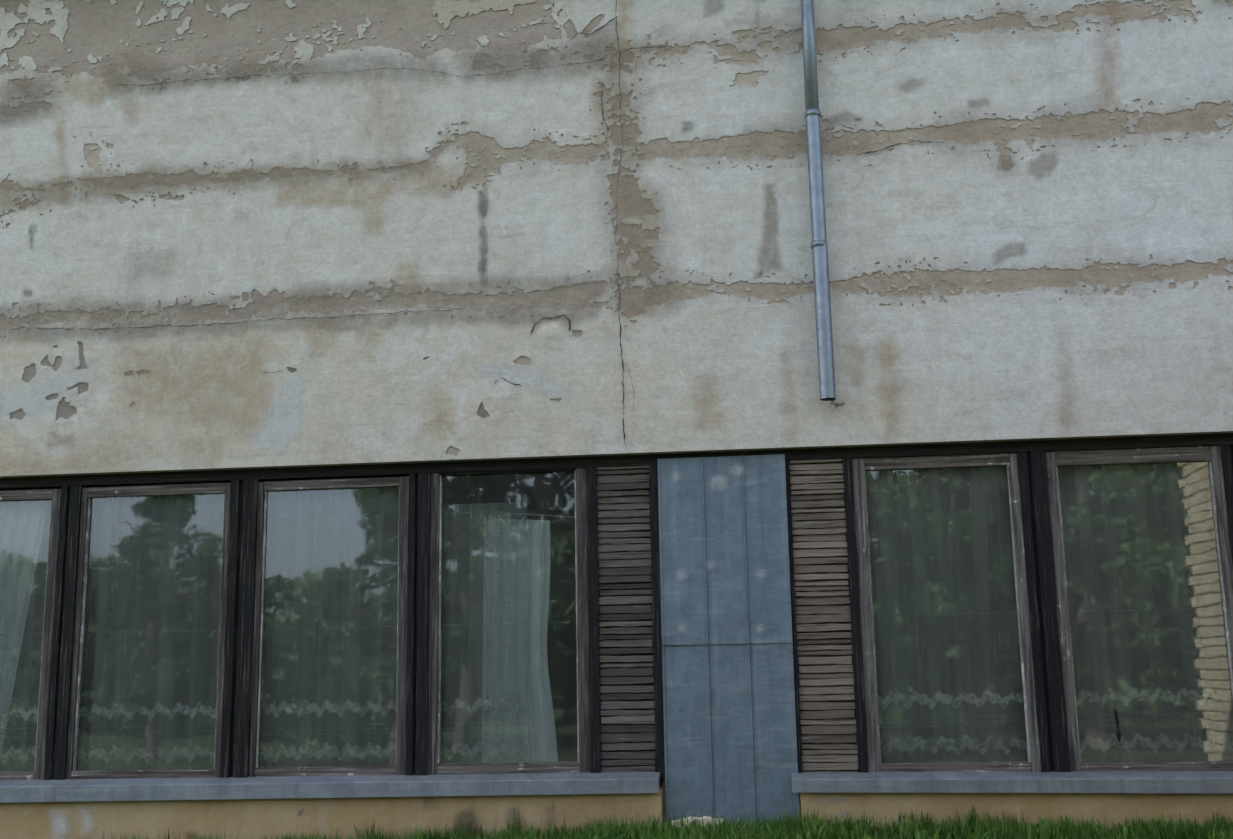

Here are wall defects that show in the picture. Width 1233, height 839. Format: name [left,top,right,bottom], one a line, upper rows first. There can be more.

peeling [0,0,1233,420]